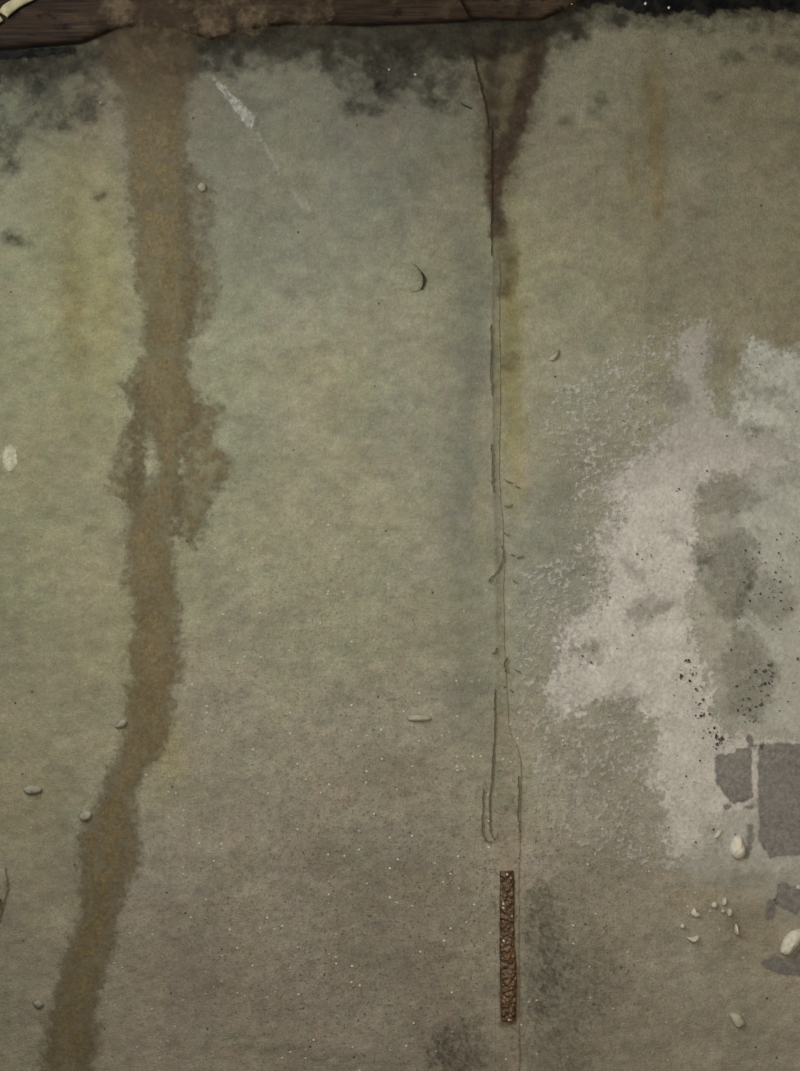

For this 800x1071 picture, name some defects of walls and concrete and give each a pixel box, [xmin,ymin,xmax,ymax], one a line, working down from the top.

crack [461,49,493,256]
crack [487,324,495,393]
leakage [0,2,628,1071]
crack [489,444,523,583]
peeling [515,314,800,919]
leakage [715,532,800,634]
crack [482,647,521,843]
leakage [673,651,730,762]
leakage [735,657,799,727]